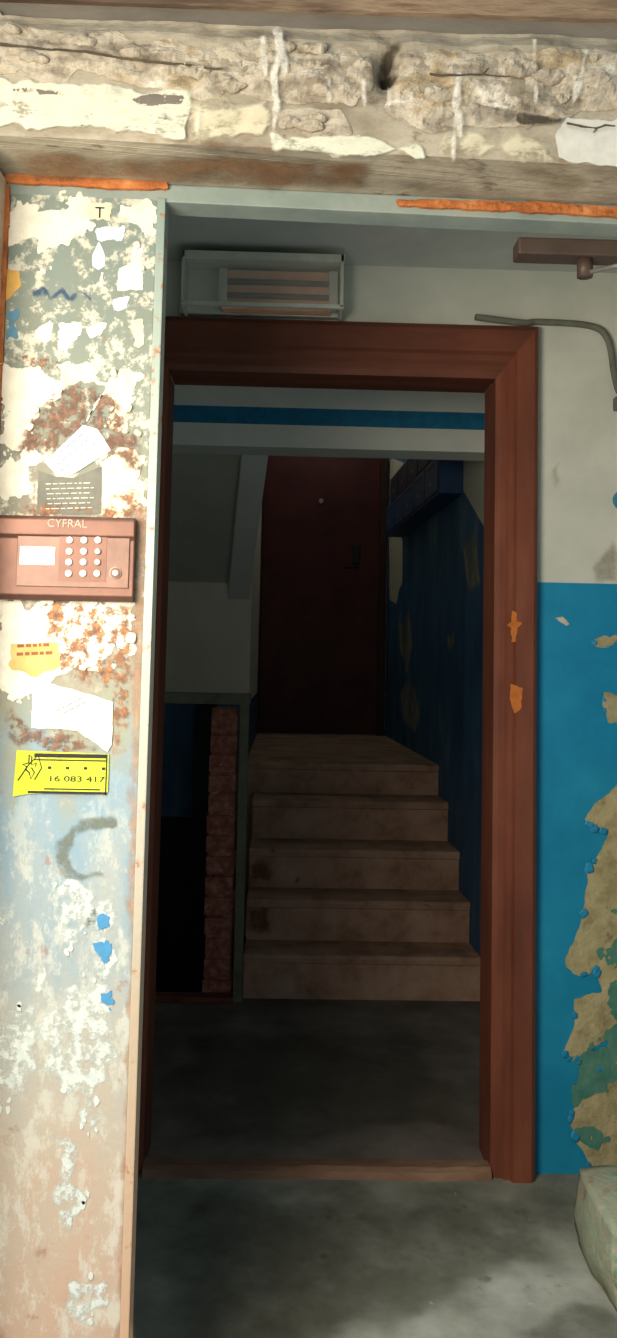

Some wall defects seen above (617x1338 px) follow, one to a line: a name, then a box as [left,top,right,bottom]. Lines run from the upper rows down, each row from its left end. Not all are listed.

crack [0,42,222,70]
water stain [260,28,287,126]
spalling [0,13,617,167]
rust [396,199,617,219]
rust [0,174,169,378]
rust [20,385,141,470]
rust [77,492,147,559]
rust [47,576,142,765]
rust [10,712,94,752]
flaking render [561,786,617,1167]
peeling [0,879,118,1227]
peeling [67,1272,109,1325]